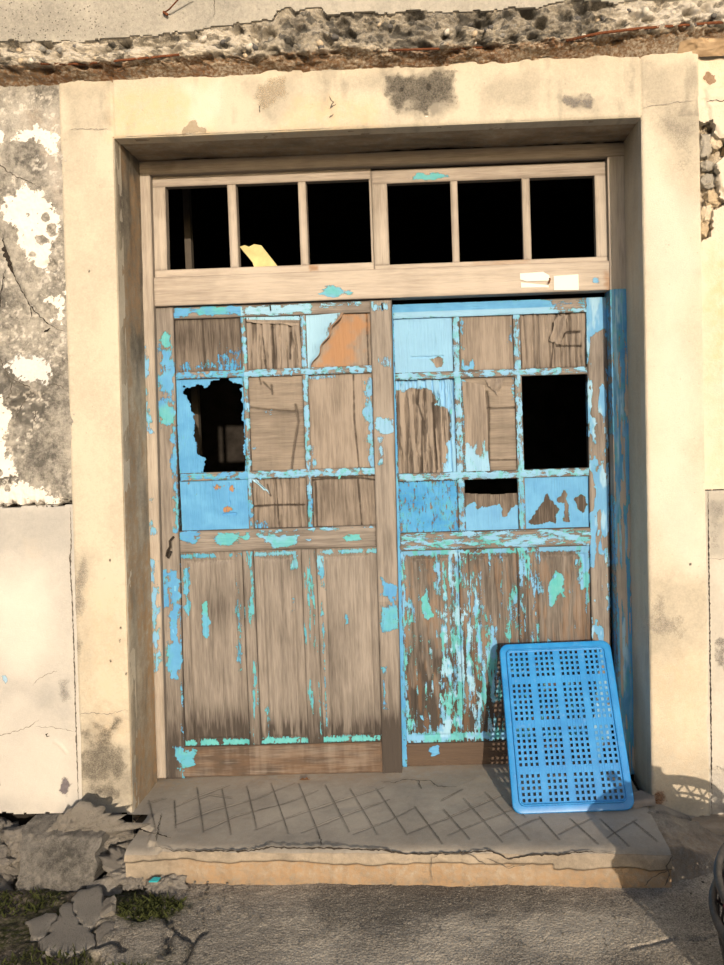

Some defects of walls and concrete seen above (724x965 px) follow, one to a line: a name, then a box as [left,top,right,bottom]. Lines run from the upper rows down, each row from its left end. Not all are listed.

spalling [0,0,724,87]
peeling [0,123,61,162]
flaking render [699,123,724,241]
peeling [0,181,62,275]
crack [0,238,63,332]
peeling [43,291,66,325]
peeling [3,354,53,386]
crack [0,359,64,422]
peeling [0,394,65,506]
crack [0,710,128,736]
crack [133,815,607,876]